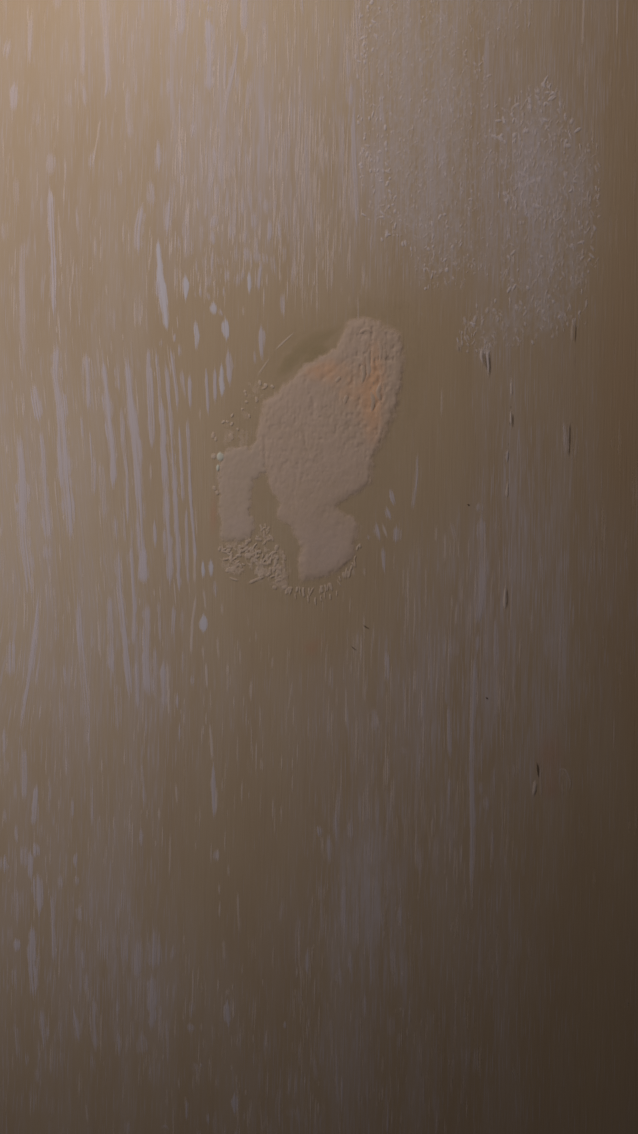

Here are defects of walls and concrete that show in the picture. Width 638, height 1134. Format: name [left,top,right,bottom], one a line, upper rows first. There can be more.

peeling [211,318,404,604]